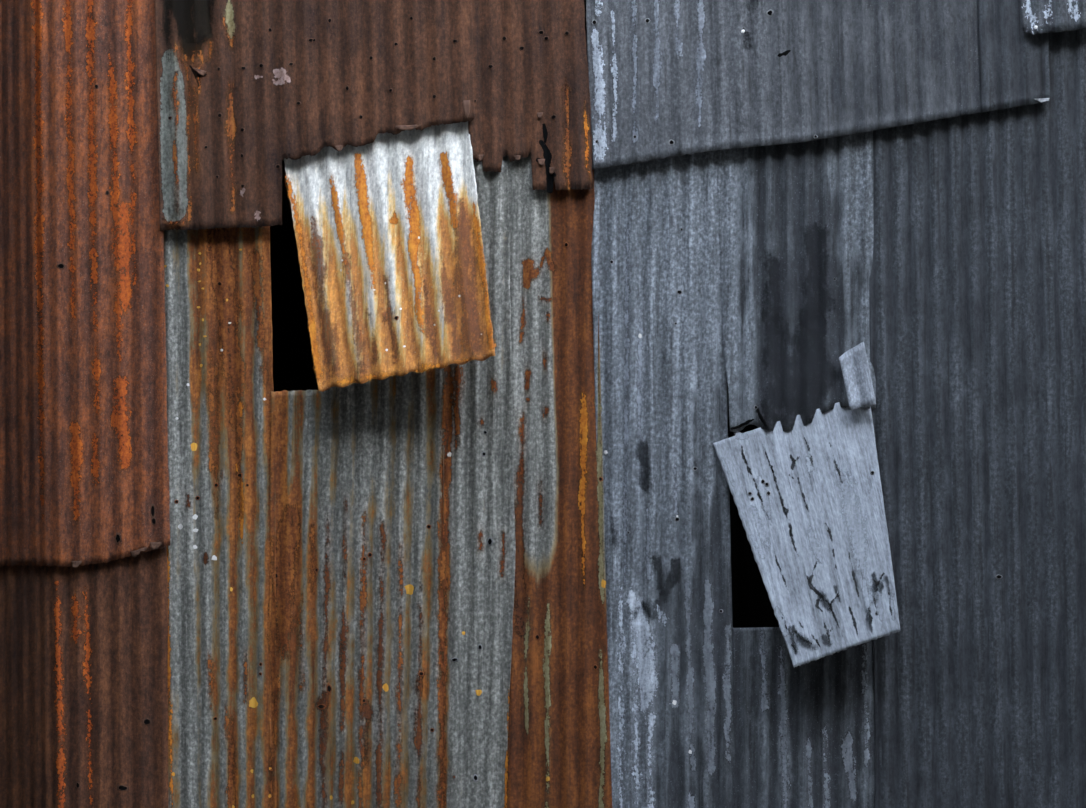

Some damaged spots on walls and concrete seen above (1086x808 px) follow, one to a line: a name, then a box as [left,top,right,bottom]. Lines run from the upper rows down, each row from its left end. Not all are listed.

corrosion [173,41,213,64]
corrosion [224,77,237,212]
corrosion [561,77,572,191]
corrosion [31,0,46,519]
corrosion [61,0,137,521]
corrosion [519,247,556,343]
corrosion [267,151,496,808]
corrosion [499,369,531,637]
corrosion [578,393,588,587]
corrosion [53,580,93,808]
corrosion [166,546,174,808]
corrosion [224,706,237,808]